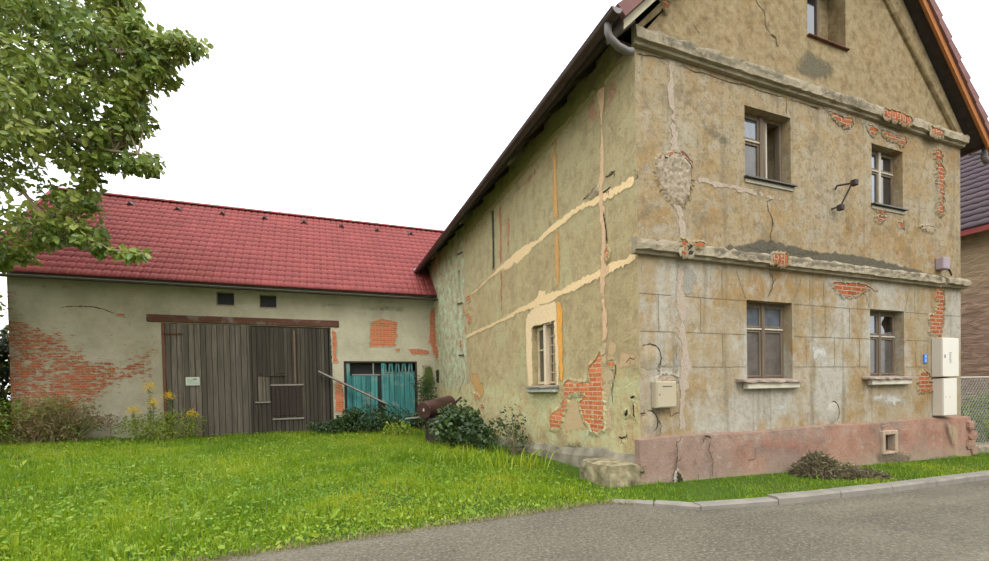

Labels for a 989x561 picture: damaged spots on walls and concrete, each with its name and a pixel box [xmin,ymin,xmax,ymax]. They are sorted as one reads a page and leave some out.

spalling [823,106,914,148]
spalling [919,124,947,235]
spalling [7,283,157,434]
spalling [334,381,345,415]
spalling [368,305,439,361]
spalling [526,301,635,438]
spalling [829,280,879,301]
spalling [916,369,934,395]
spalling [927,287,946,338]